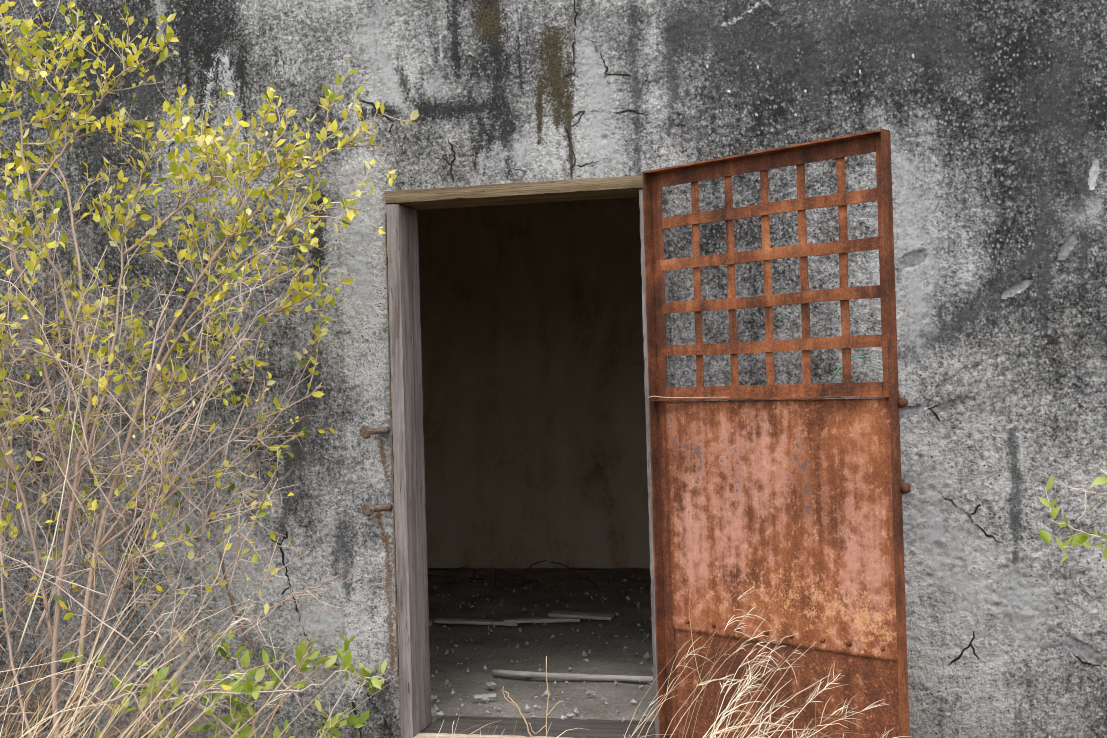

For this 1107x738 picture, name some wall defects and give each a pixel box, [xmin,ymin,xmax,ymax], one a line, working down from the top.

water stain [356,0,545,177]
water stain [561,91,575,179]
water stain [899,25,1104,361]
rust [377,435,389,482]
crack [938,491,1007,546]
crack [949,631,979,665]